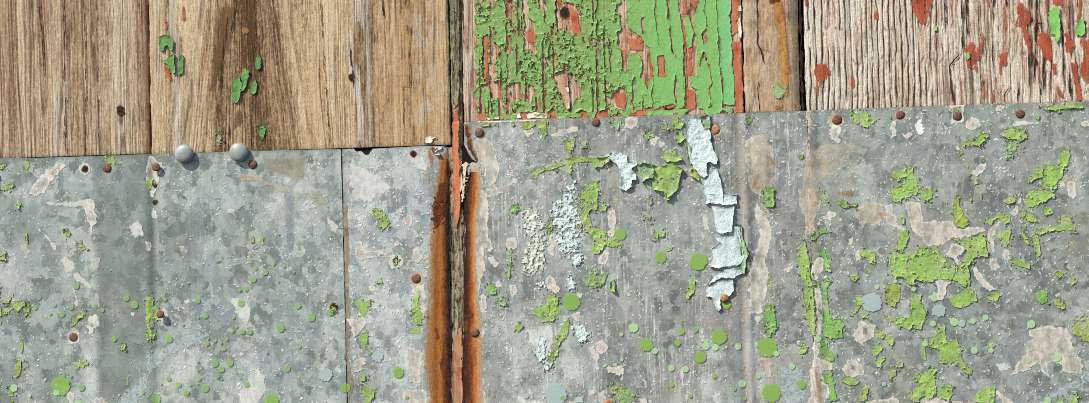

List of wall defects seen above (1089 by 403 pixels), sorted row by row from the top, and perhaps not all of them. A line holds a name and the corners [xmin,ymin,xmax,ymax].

peeling [912,0,937,31]
peeling [159,21,184,81]
peeling [231,55,261,103]
corrosion [774,2,789,109]
peeling [814,64,830,95]
peeling [956,34,985,72]
peeling [991,51,1008,102]
peeling [1011,0,1089,120]
peeling [473,0,754,371]
corrosion [421,124,483,403]
peeling [789,126,1077,403]
peeling [1071,313,1089,342]